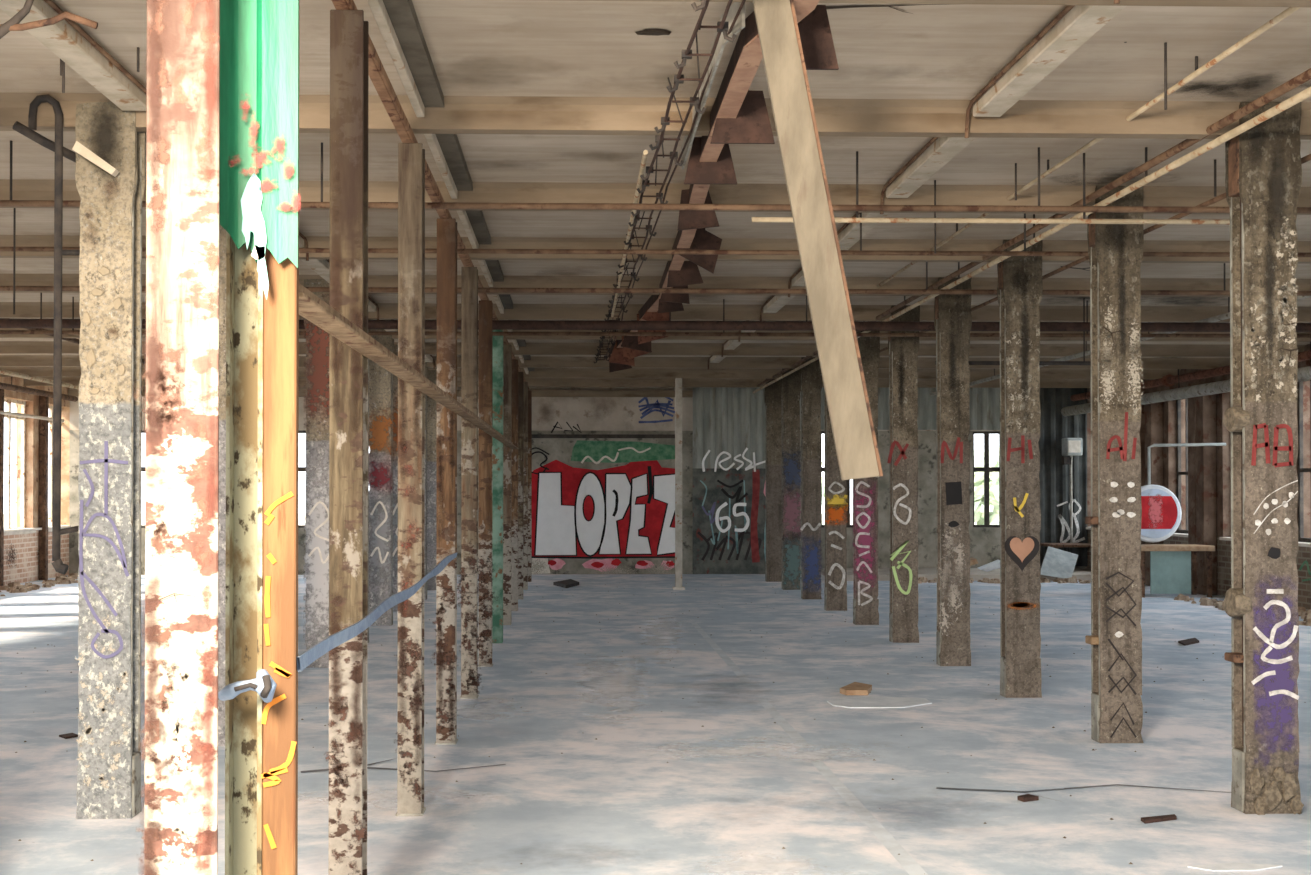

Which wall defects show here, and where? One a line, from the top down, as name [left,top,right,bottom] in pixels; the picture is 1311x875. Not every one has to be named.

leakage [91,111,117,164]
leakage [1181,78,1266,93]
peeling [161,429,203,542]
peeling [154,648,210,875]